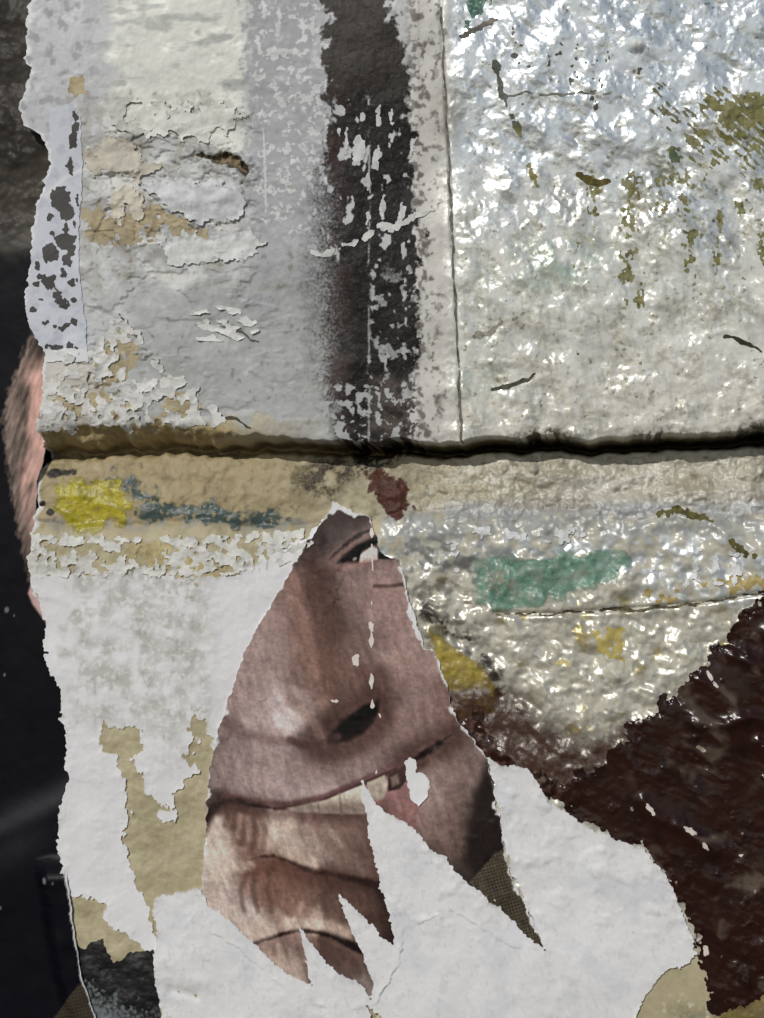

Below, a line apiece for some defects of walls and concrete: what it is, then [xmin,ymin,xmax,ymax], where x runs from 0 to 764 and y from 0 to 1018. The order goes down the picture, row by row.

peeling [310,194,435,258]
peeling [191,305,260,342]
peeling [37,318,232,452]
peeling [27,528,314,578]
peeling [404,757,430,806]